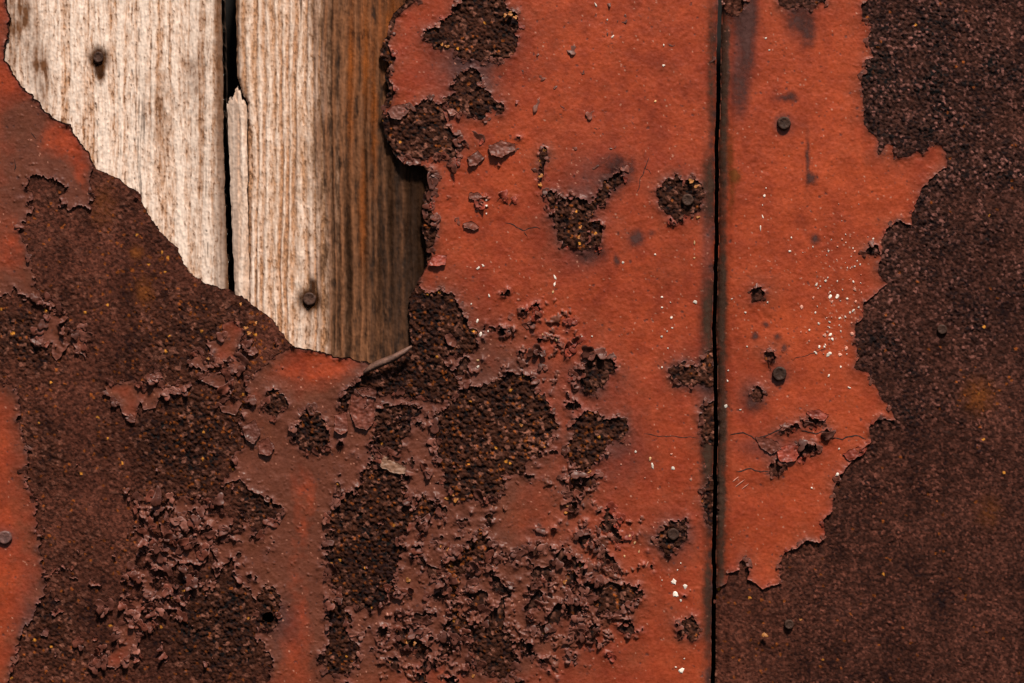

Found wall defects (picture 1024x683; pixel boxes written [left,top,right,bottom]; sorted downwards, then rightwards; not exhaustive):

rust [656,172,705,226]
peeling [28,292,94,355]
peeling [187,321,270,408]
rust [316,0,630,683]
peeling [558,318,606,383]
rust [668,0,1024,683]
rust [0,165,331,683]
peeling [243,420,275,456]
peeling [326,385,384,435]
peeling [366,444,406,474]
peeling [756,409,835,466]
peeling [379,469,637,682]